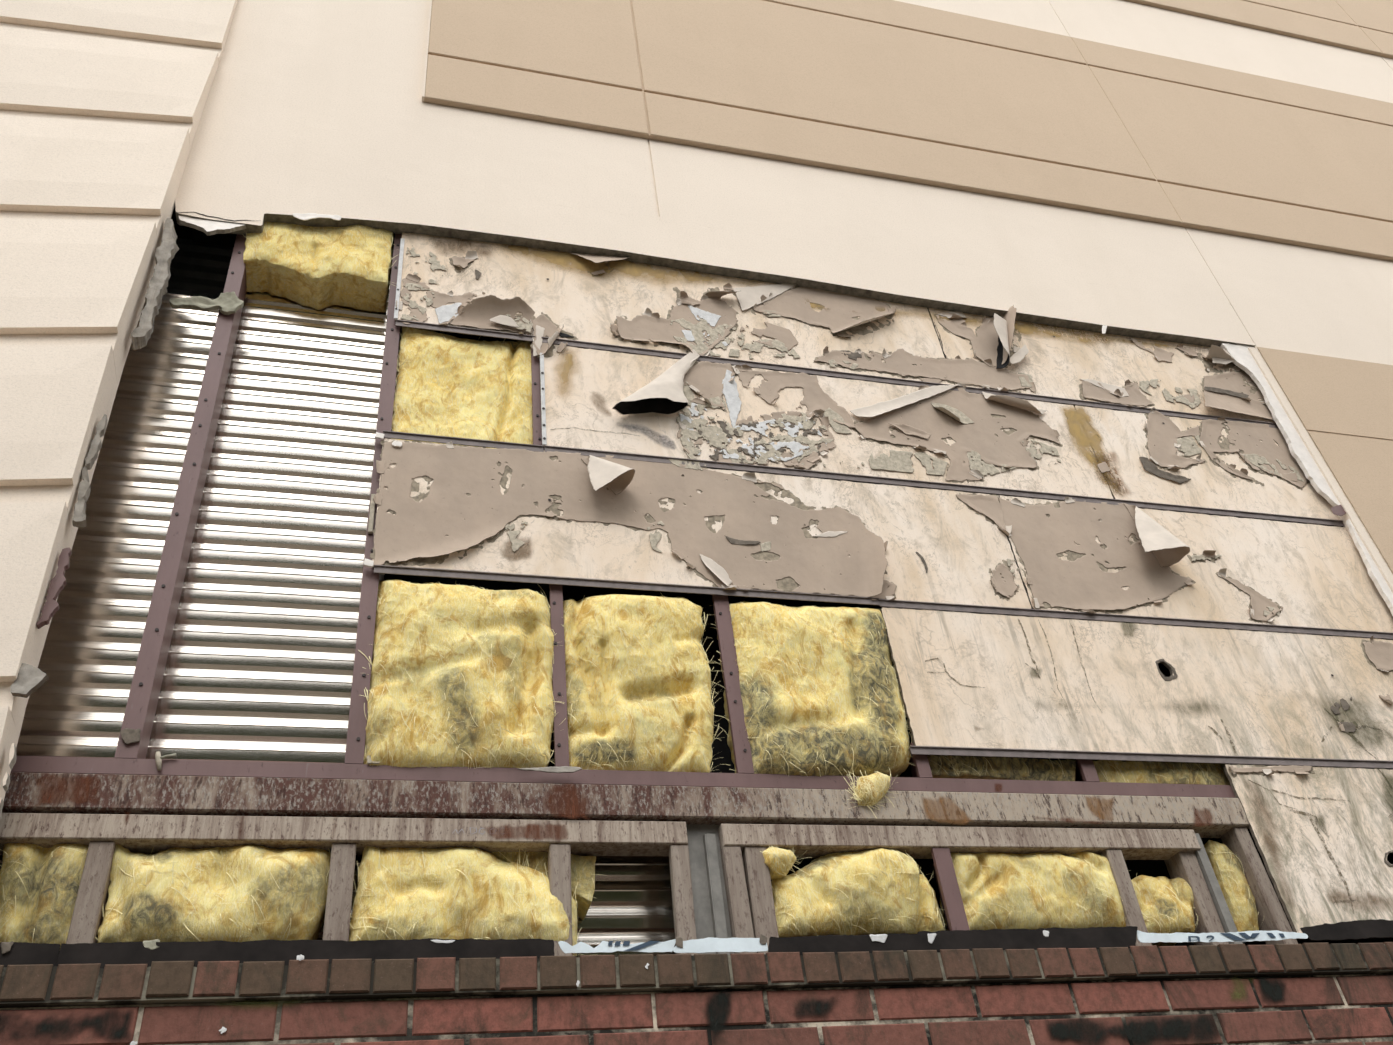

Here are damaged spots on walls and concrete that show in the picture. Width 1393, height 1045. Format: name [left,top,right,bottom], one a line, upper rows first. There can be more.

flaking render [131,207,246,350]
spalling [427,329,520,342]
flaking render [72,414,108,528]
damp [1064,408,1126,492]
flaking render [36,548,72,629]
flaking render [10,663,49,698]
spalling [384,574,1393,777]
rust [492,785,585,839]
spalling [771,858,817,881]
spalling [914,859,948,931]
spalling [1125,860,1171,880]
spalling [1248,829,1393,944]